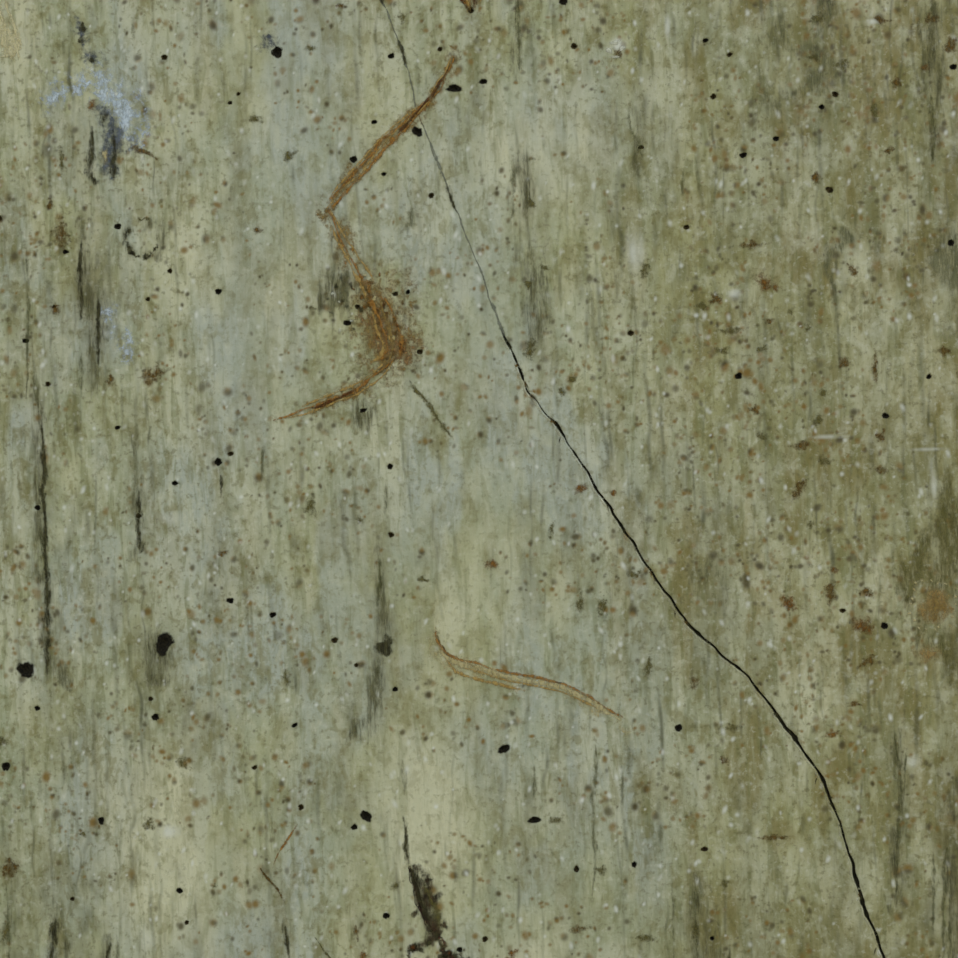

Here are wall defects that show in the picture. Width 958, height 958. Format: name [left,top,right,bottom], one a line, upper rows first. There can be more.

corrosion [273,46,461,421]
crack [380,0,889,958]
corrosion [434,632,626,733]